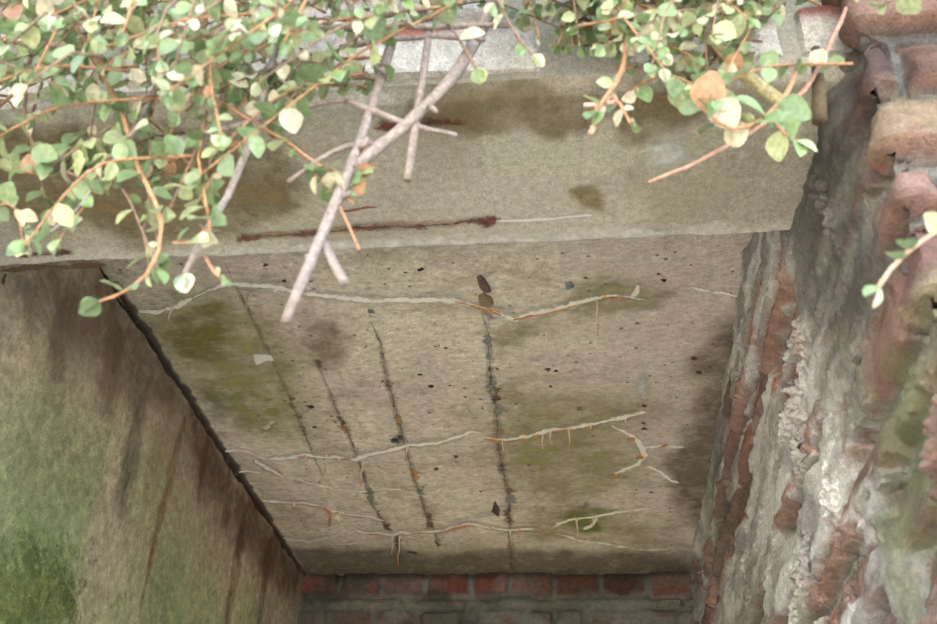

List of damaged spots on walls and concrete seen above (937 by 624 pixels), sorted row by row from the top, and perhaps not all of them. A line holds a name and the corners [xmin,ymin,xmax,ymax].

leakage [572,187,600,207]
rust [330,216,501,233]
rust [237,231,317,242]
leakage [253,354,274,365]
crack [99,267,685,575]